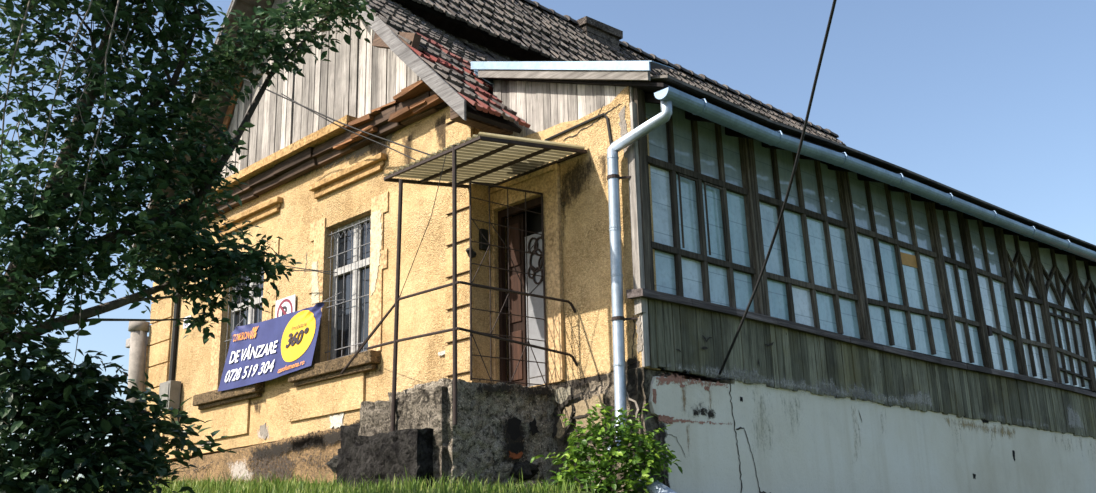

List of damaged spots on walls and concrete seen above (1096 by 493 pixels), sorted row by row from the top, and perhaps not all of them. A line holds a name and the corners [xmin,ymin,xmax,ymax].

damp [560,156,606,209]
peeling [653,359,932,425]
damp [229,420,360,479]
crack [729,384,771,493]